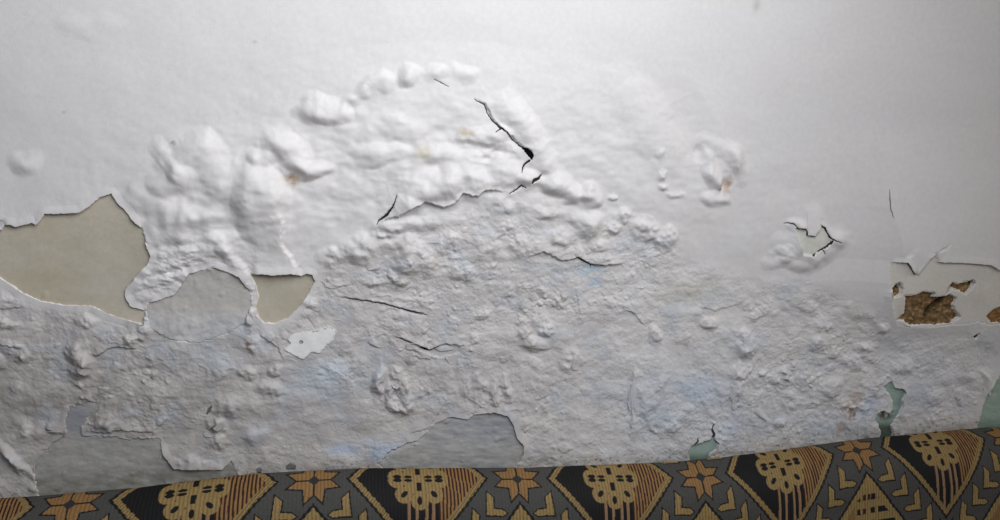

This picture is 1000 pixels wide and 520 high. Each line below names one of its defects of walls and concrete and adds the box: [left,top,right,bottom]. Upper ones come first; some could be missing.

crack [475,99,542,194]
peeling [0,187,318,343]
crack [376,195,397,225]
crack [786,222,841,256]
peeling [890,253,1000,338]
peeling [379,407,529,468]
peeling [688,437,722,460]
peeling [875,382,910,437]
peeling [975,348,1000,428]